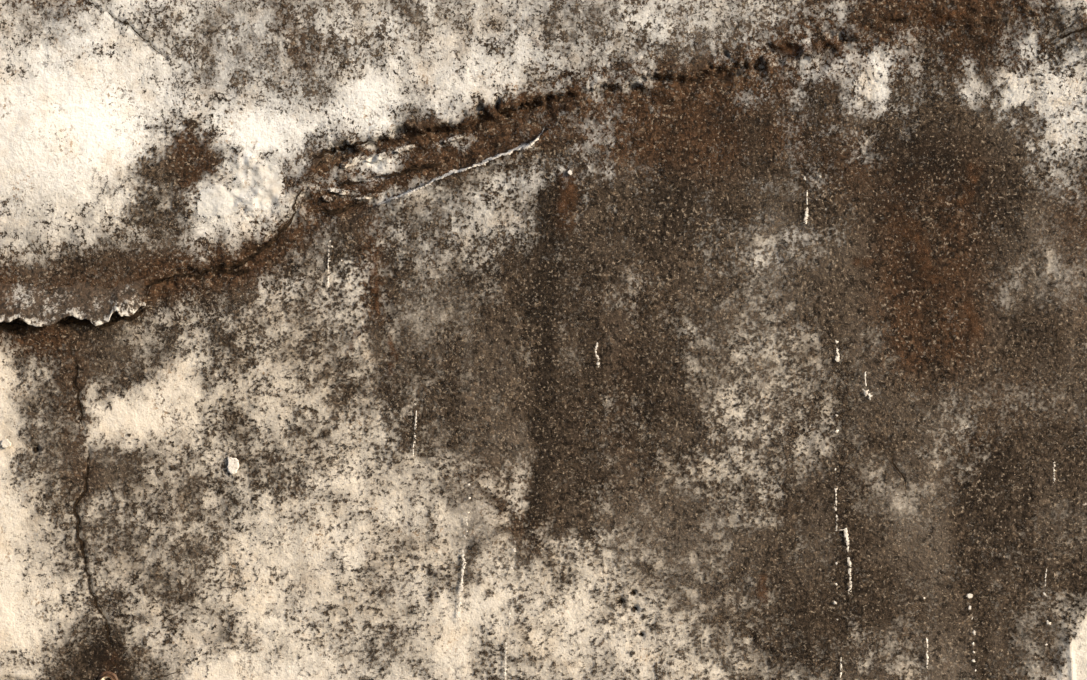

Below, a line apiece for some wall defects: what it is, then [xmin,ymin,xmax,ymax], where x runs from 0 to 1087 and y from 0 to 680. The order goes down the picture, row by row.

damp [0,0,111,85]
crack [84,0,232,55]
crack [1051,27,1087,42]
flaking render [268,80,575,206]
crack [143,140,446,296]
flaking render [0,279,146,331]
crack [73,359,111,650]
damp [570,628,651,680]